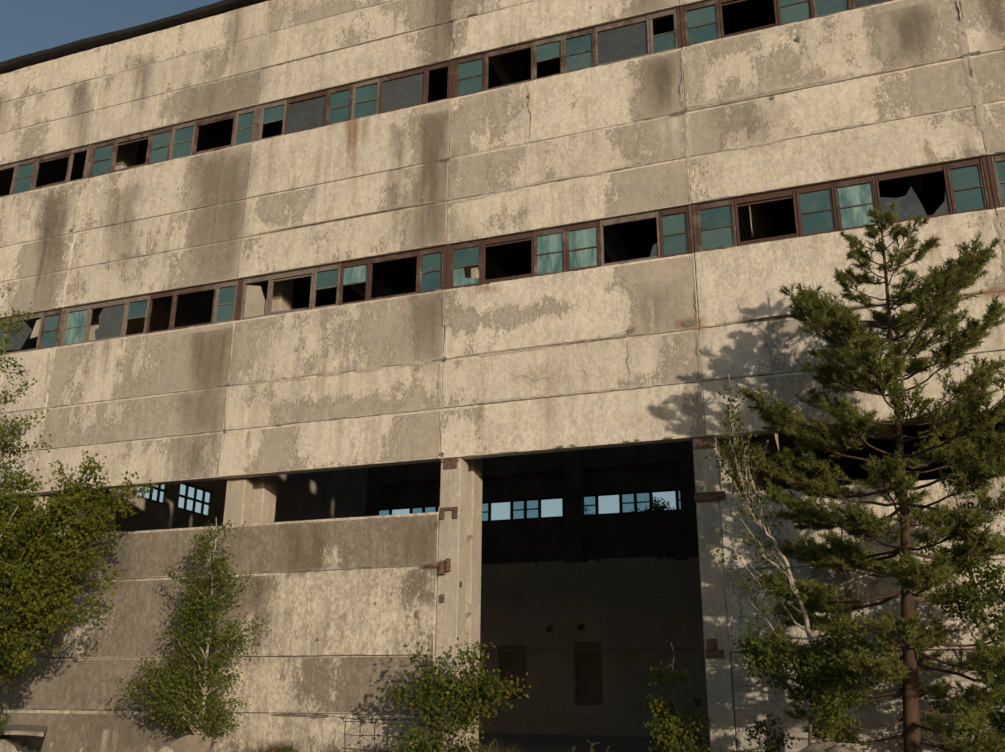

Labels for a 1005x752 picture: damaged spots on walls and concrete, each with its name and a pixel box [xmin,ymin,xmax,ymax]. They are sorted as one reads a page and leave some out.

crack [952,0,977,100]
water stain [423,116,445,187]
water stain [43,197,66,256]
peeling [0,514,439,752]